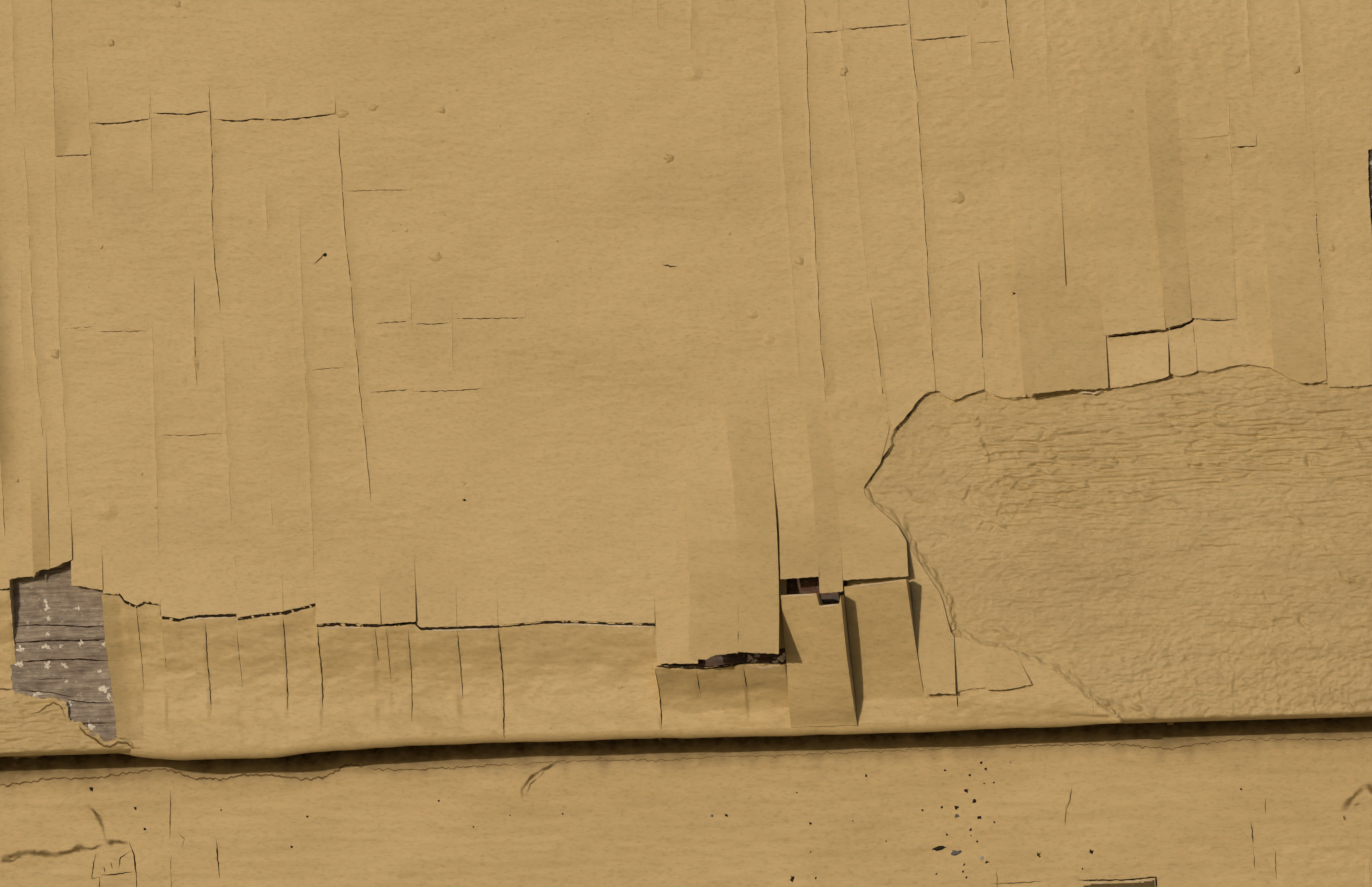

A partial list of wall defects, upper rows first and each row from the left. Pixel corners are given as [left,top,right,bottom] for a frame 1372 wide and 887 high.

crack [0,0,32,536]
crack [64,84,381,500]
peeling [0,363,1032,757]
crack [800,0,944,402]
crack [867,299,900,427]
crack [974,262,993,382]
crack [1001,0,1026,79]
spalling [776,0,1372,724]